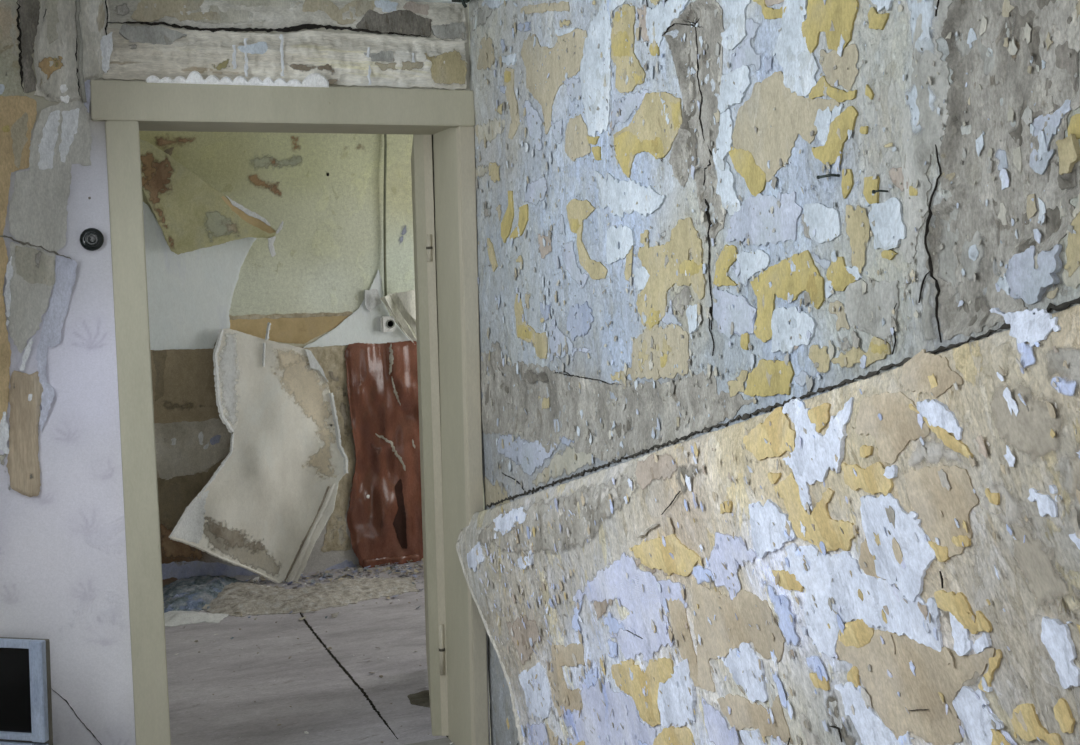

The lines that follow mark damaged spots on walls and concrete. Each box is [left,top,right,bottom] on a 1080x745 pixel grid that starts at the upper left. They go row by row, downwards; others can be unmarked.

peeling [0,0,28,97]
peeling [60,84,70,104]
peeling [100,32,113,74]
crack [105,0,427,37]
crack [646,0,715,356]
crack [891,144,942,354]
crack [553,371,621,385]
flaking render [471,0,1080,745]
peeling [151,347,258,580]
flaking render [296,345,358,570]
crack [51,688,102,745]
crack [300,612,398,739]